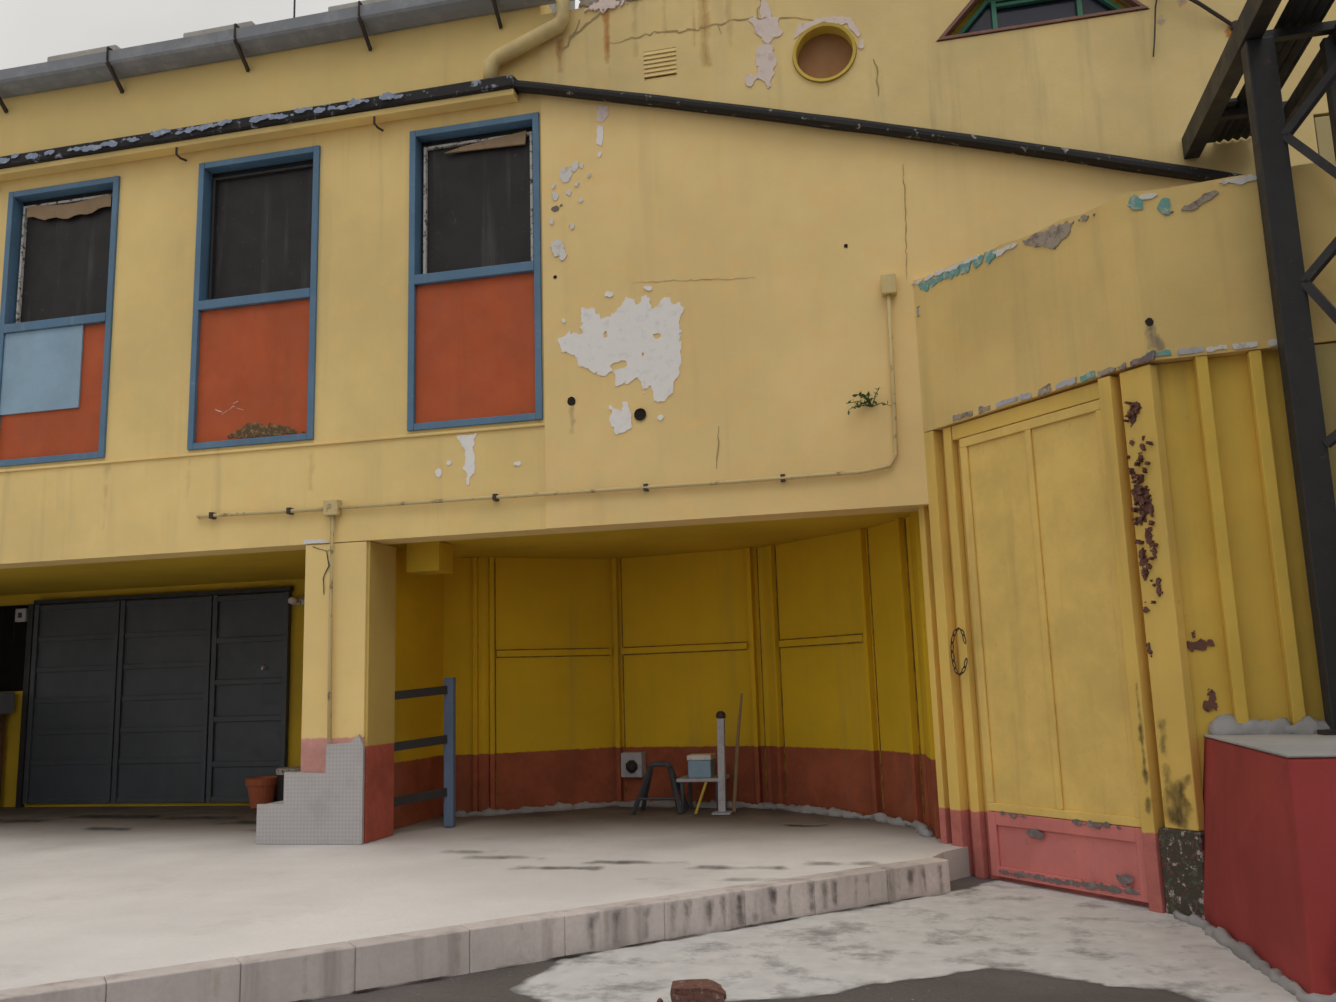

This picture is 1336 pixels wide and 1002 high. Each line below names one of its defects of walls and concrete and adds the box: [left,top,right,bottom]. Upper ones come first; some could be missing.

spalling [578,0,633,14]
peeling [745,0,864,89]
peeling [249,92,403,123]
peeling [0,119,232,164]
peeling [550,161,591,279]
peeling [1127,174,1257,215]
peeling [911,214,1095,292]
peeling [557,286,684,435]
peeling [435,433,477,485]
peeling [1122,401,1163,613]
peeling [1186,630,1215,652]
peeling [1203,688,1218,712]